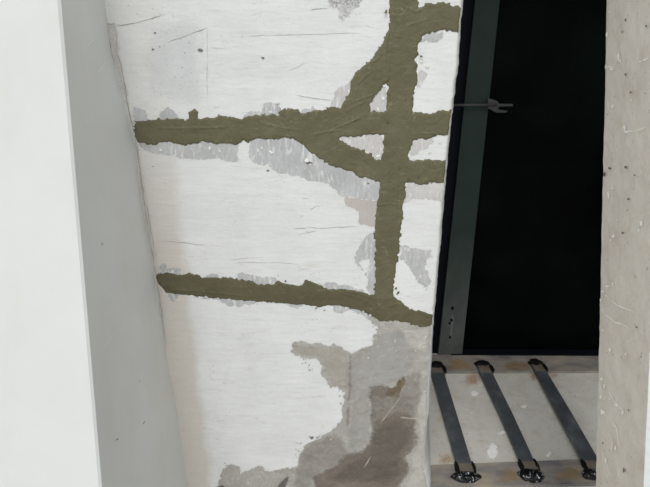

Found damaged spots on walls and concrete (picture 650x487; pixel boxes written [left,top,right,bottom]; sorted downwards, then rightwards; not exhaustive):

crack [243,31,344,39]
crack [107,15,197,348]
peeling [244,102,281,117]
peeling [248,137,380,295]
peeling [341,134,384,160]
peeling [399,245,432,287]
spalling [218,305,431,487]
water stain [312,373,423,487]